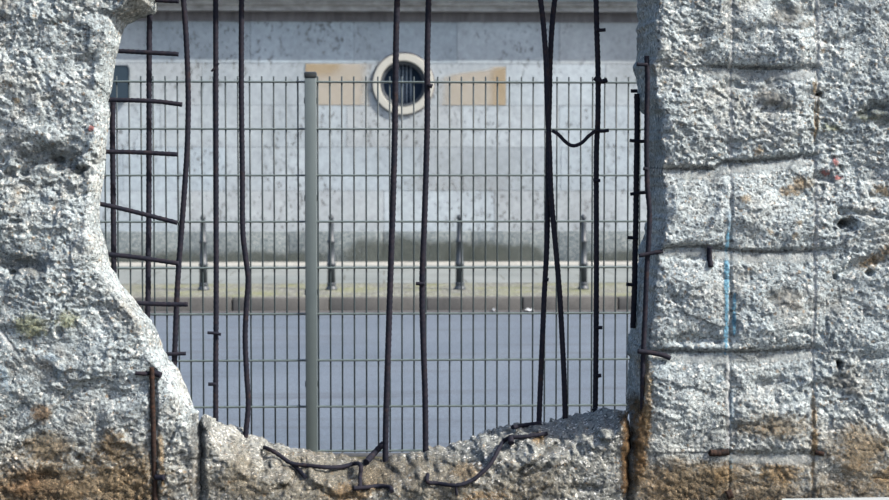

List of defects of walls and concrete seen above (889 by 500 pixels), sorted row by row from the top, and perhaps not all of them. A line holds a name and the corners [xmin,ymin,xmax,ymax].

rust [33,405,51,420]
rust [0,430,169,500]
spalling [100,0,191,367]
spalling [135,367,165,500]
spalling [207,0,221,421]
spalling [238,0,251,438]
spalling [263,0,400,493]
spalling [416,0,433,453]
spalling [425,0,568,496]
spalling [592,0,609,412]
spalling [626,56,672,415]
rust [617,356,889,500]